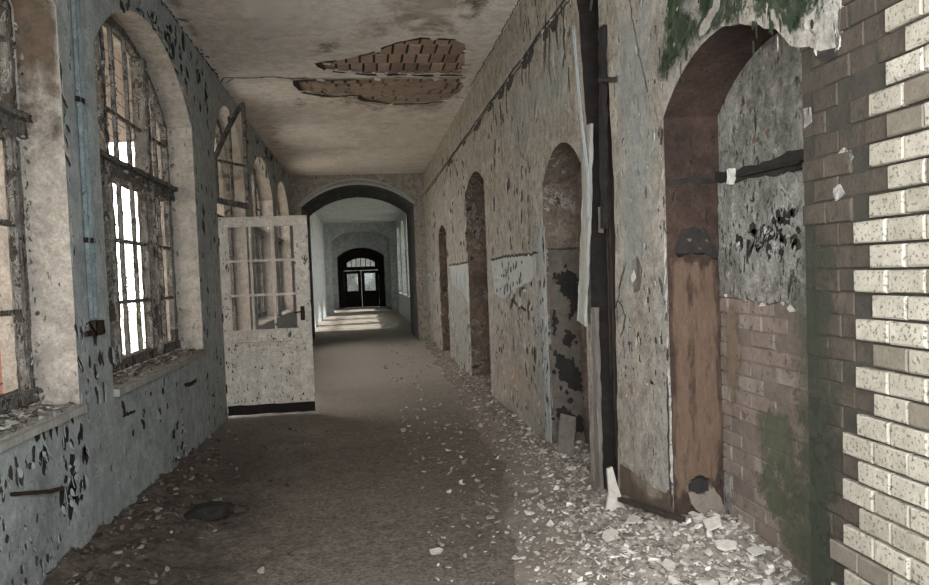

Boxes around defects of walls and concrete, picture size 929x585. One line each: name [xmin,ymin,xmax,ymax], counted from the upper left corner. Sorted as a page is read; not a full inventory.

spalling [293,36,473,106]
peeling [0,23,38,273]
peeling [101,55,179,256]
spalling [488,95,585,443]
spalling [717,0,929,585]
peeling [74,319,130,404]
peeling [0,407,92,520]
peeling [150,378,188,463]
peeling [11,524,61,585]